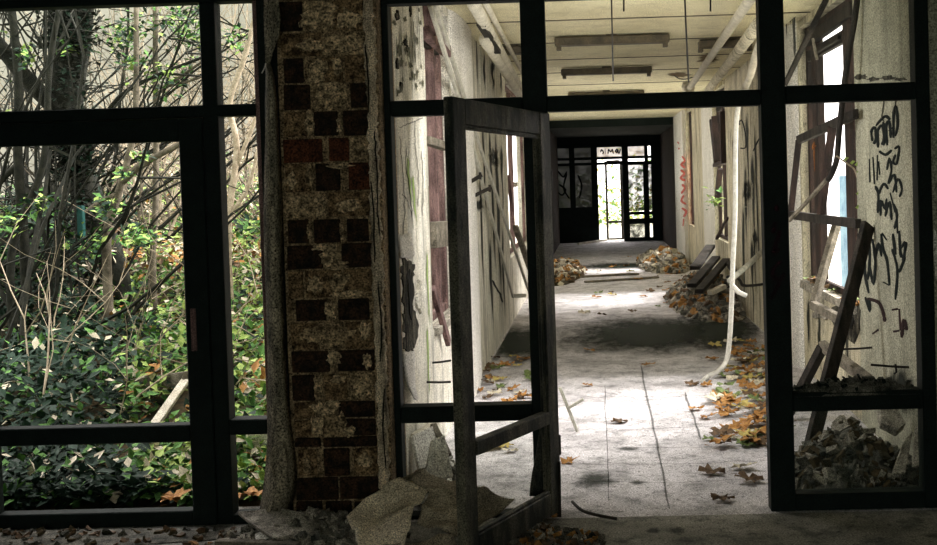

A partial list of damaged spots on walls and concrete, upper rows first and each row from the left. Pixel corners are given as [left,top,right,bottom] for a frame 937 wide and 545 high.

peeling [392,6,424,97]
peeling [285,0,391,489]
spalling [398,233,425,400]
crack [641,366,670,509]